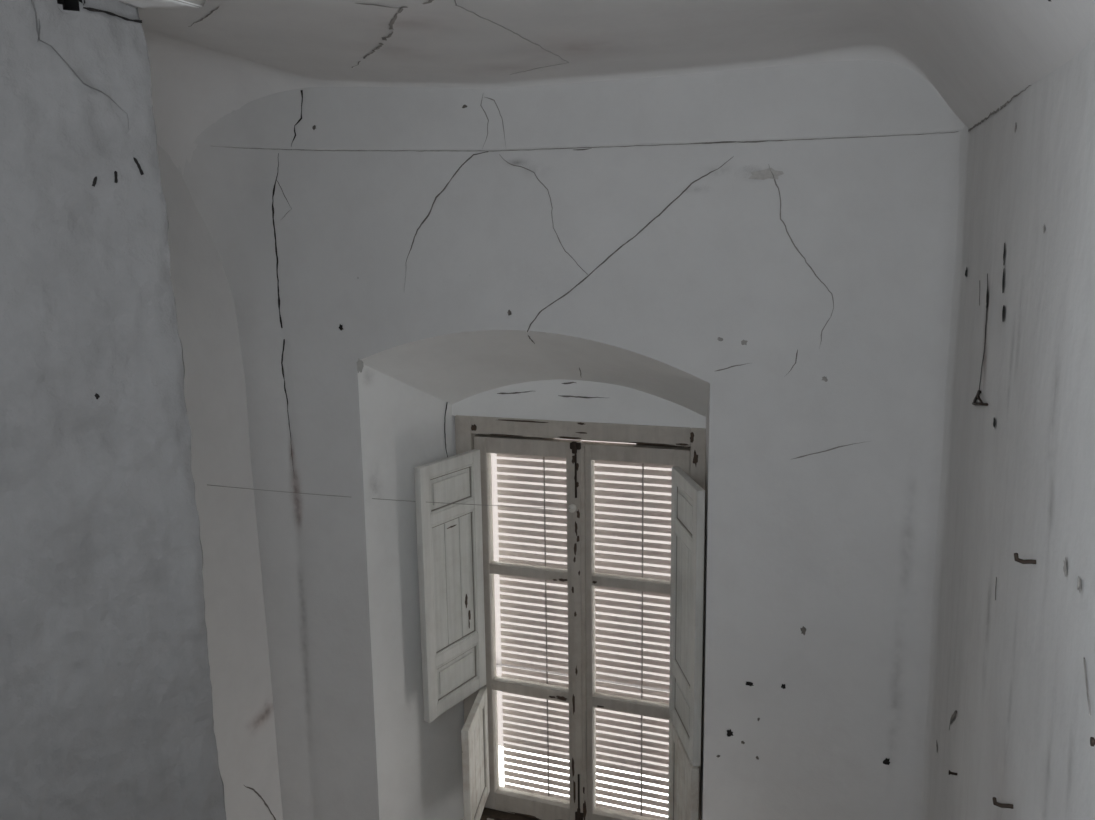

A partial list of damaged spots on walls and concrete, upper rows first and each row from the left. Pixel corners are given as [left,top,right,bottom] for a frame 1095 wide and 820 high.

crack [352,0,569,75]
crack [215,85,1032,471]